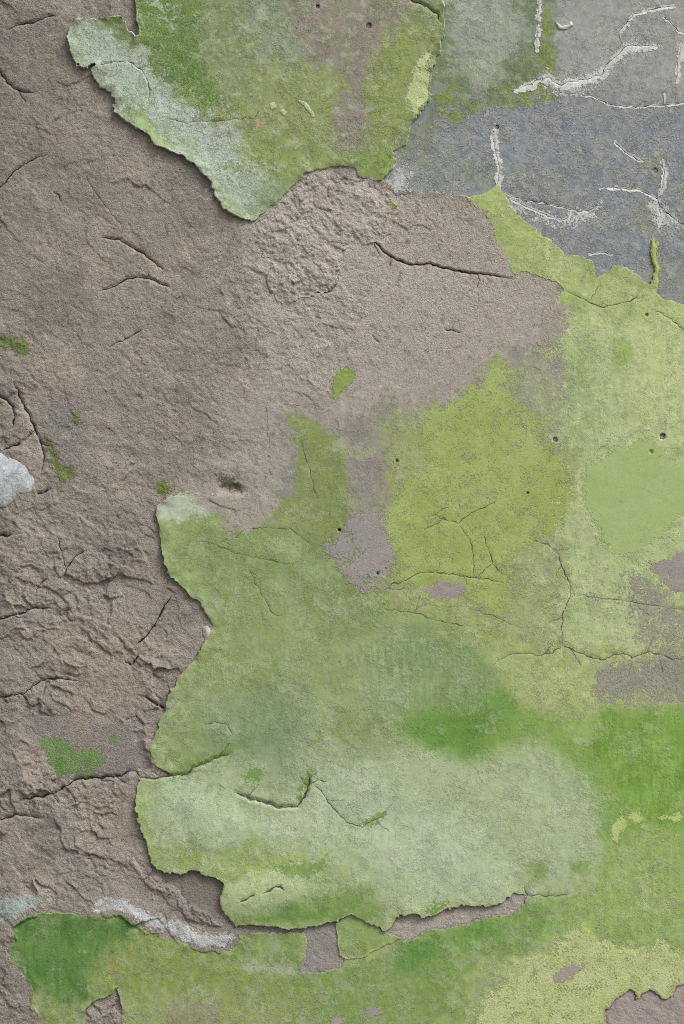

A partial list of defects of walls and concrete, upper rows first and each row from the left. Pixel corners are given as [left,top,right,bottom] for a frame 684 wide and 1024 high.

crack [514,0,684,109]
peeling [66,0,684,304]
crack [489,122,684,233]
crack [85,174,169,291]
crack [374,242,512,288]
peeling [323,347,684,624]
crack [126,599,170,665]
crack [493,540,683,669]
crack [0,677,79,700]
crack [0,721,232,820]
spalling [125,857,227,929]
peeling [473,923,684,1024]